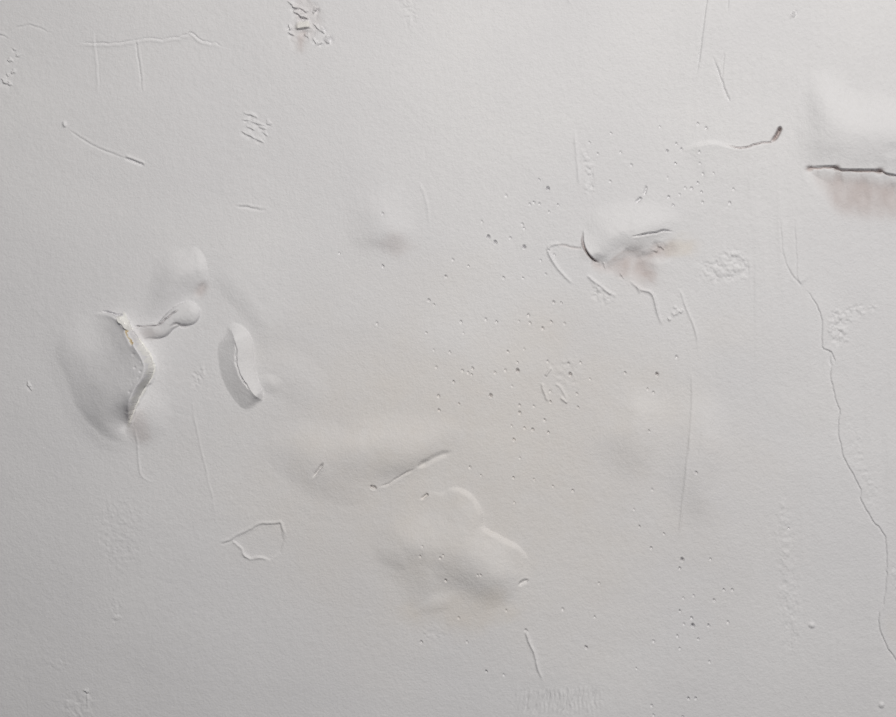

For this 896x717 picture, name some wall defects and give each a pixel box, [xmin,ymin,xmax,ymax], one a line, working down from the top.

peeling [288,0,329,52]
crack [75,27,228,99]
crack [721,124,784,150]
crack [779,211,896,663]